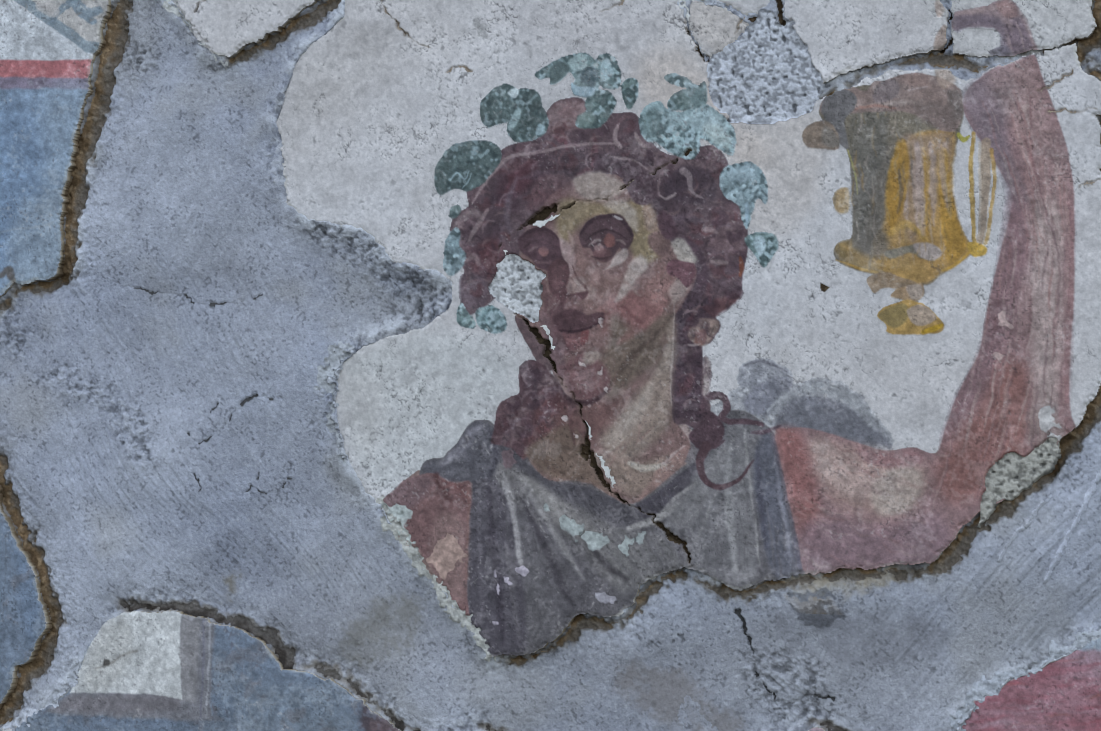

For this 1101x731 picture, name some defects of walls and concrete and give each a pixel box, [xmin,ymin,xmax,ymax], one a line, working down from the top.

crack [678,0,709,62]
crack [738,0,786,26]
spalling [706,11,825,124]
crack [940,9,953,53]
spalling [306,222,452,333]
spalling [488,254,546,323]
crack [523,319,557,373]
crack [579,403,691,563]
spalling [977,405,1062,528]
spalling [376,496,500,662]
crack [734,609,752,645]
spalling [733,640,836,727]